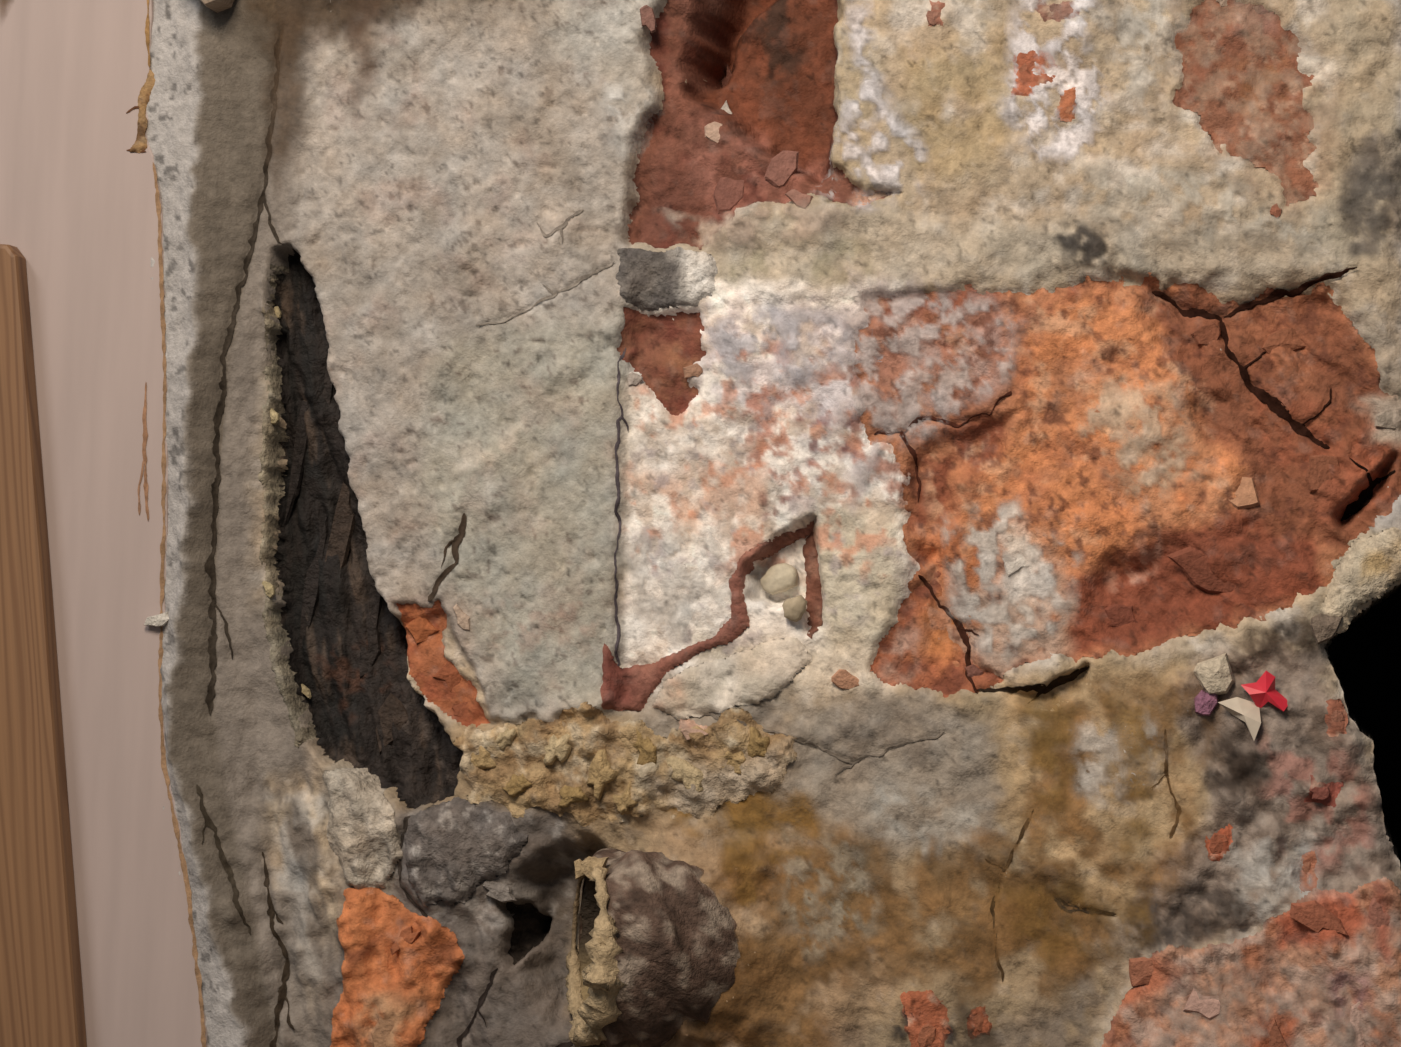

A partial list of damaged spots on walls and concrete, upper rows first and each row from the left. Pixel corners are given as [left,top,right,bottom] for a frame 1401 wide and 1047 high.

spalling [627,0,900,250]
leakage [699,6,925,243]
leakage [1003,0,1099,160]
leakage [1106,0,1184,111]
spalling [617,307,706,416]
crack [874,391,1012,502]
spalling [831,272,1401,698]
crack [1152,267,1395,521]
peeling [600,520,823,748]
crack [918,575,1089,703]
leakage [1077,725,1136,795]
crack [196,785,295,1047]